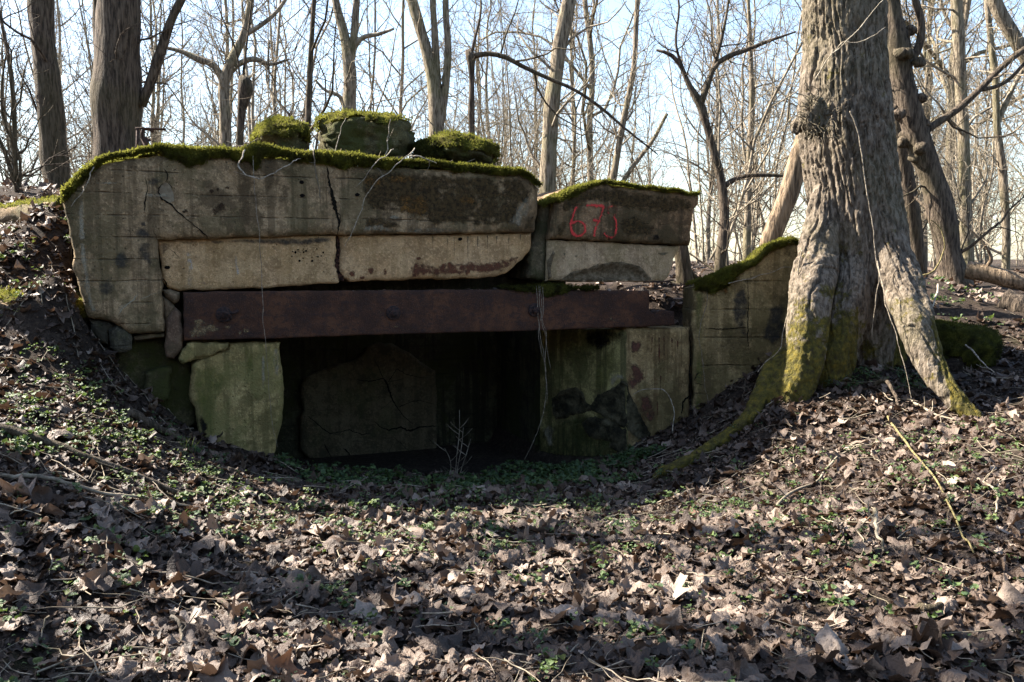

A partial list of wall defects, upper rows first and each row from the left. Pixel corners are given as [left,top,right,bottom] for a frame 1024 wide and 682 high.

crack [144,169,208,254]
crack [327,168,344,281]
corrosion [411,257,518,277]